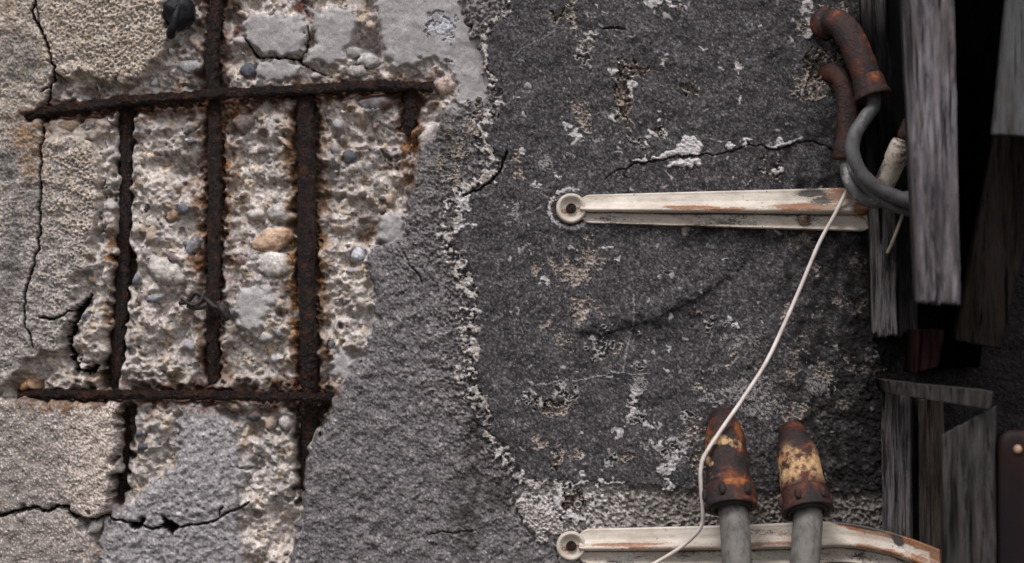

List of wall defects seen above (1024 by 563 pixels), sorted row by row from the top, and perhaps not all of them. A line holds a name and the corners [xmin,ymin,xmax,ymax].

crack [24,0,101,376]
crack [463,151,508,197]
crack [606,135,833,190]
rust [104,235,117,266]
spalling [0,0,719,563]
crack [0,502,250,536]
spalling [748,491,793,524]
spalling [823,490,882,529]